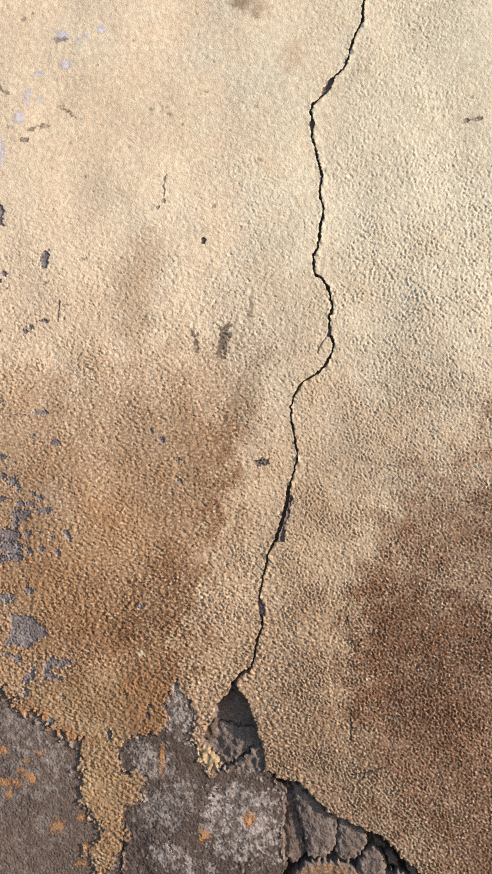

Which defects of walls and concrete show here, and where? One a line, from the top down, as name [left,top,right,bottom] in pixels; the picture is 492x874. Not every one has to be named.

crack [232,0,365,685]
peeling [0,584,48,663]
peeling [0,453,73,564]
damp [0,419,238,874]
peeling [0,655,420,874]
damp [352,512,492,808]